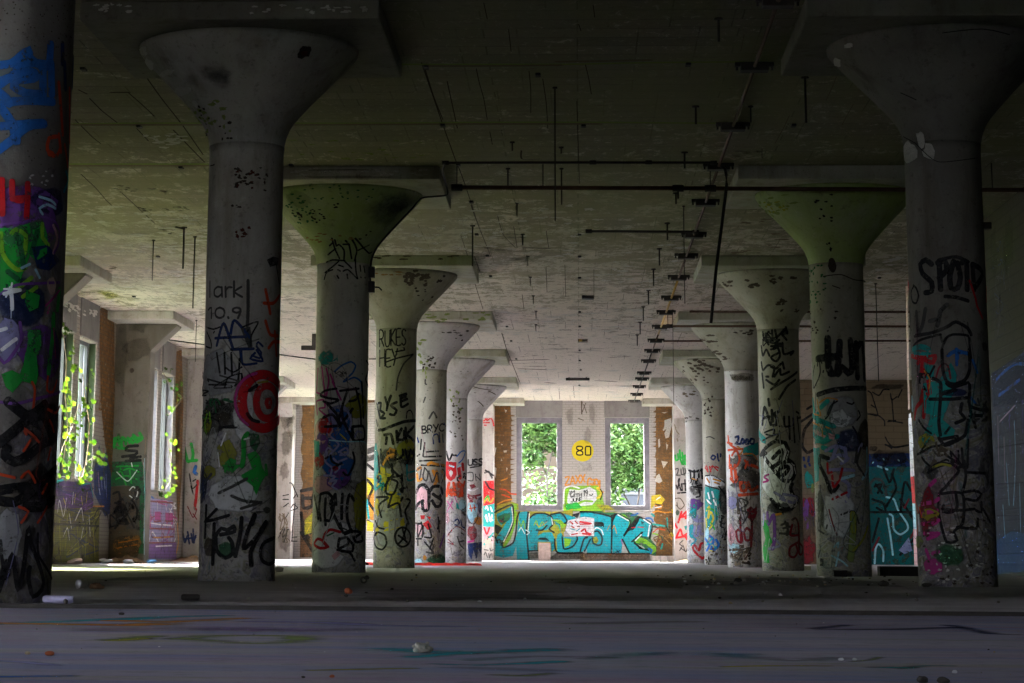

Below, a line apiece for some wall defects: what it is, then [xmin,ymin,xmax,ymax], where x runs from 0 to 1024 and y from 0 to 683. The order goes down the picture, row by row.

peeling [903,132,935,163]
flaking render [494,369,591,510]
flaking render [653,407,673,556]